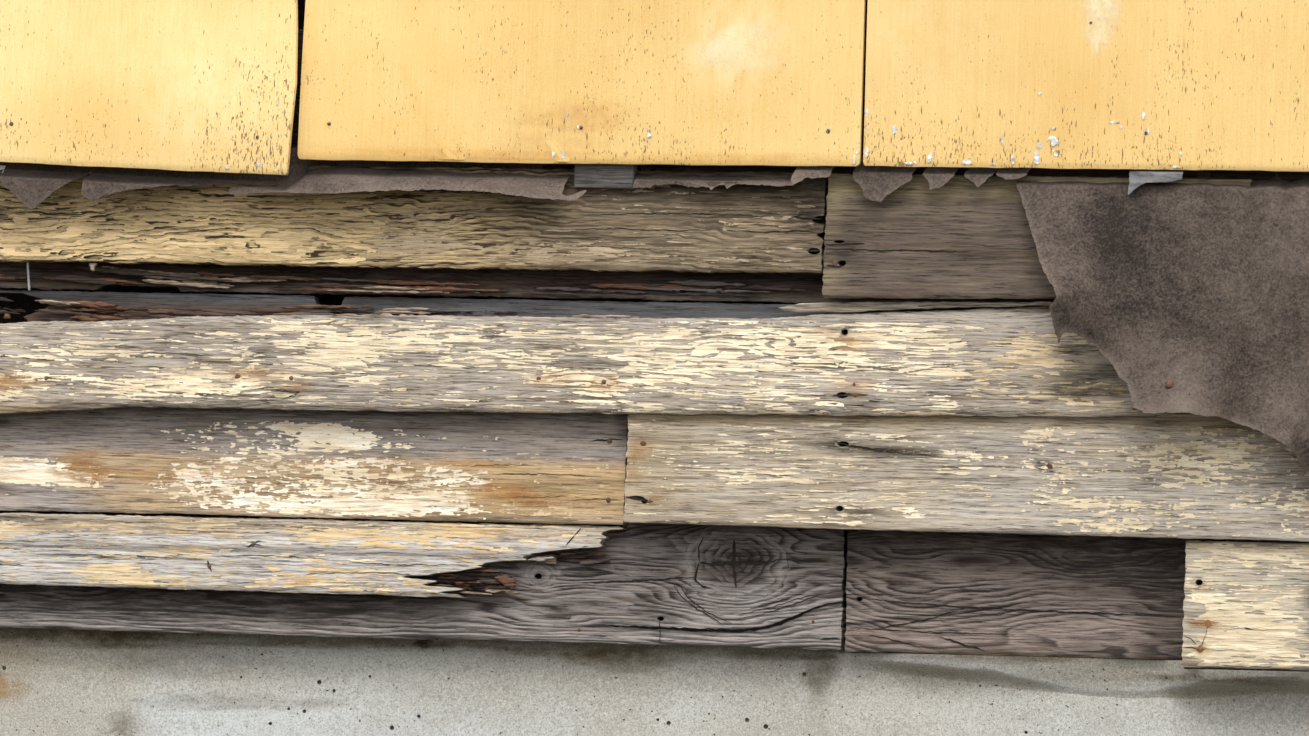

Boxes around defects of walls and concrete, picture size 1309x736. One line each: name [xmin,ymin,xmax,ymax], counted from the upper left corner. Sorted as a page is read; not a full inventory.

peeling [0,166,815,270]
peeling [0,317,1309,668]